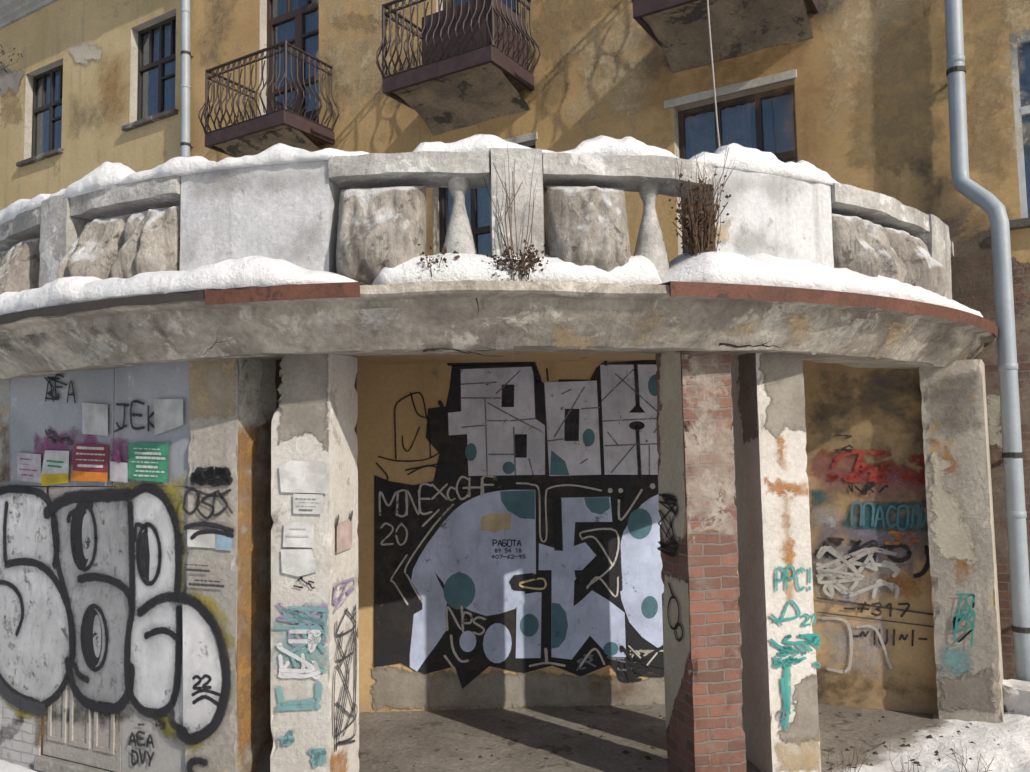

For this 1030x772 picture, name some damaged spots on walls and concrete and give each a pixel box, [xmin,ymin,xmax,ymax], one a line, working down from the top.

peeling [0,63,24,122]
peeling [69,41,102,65]
flaking render [946,219,996,325]
corrosion [237,419,274,772]
spalling [238,354,329,451]
peeling [658,351,806,551]
corrosion [764,478,808,496]
corrosion [783,541,795,598]
flaking render [927,338,1016,713]
flaking render [1011,252,1030,578]
spalling [775,673,820,772]